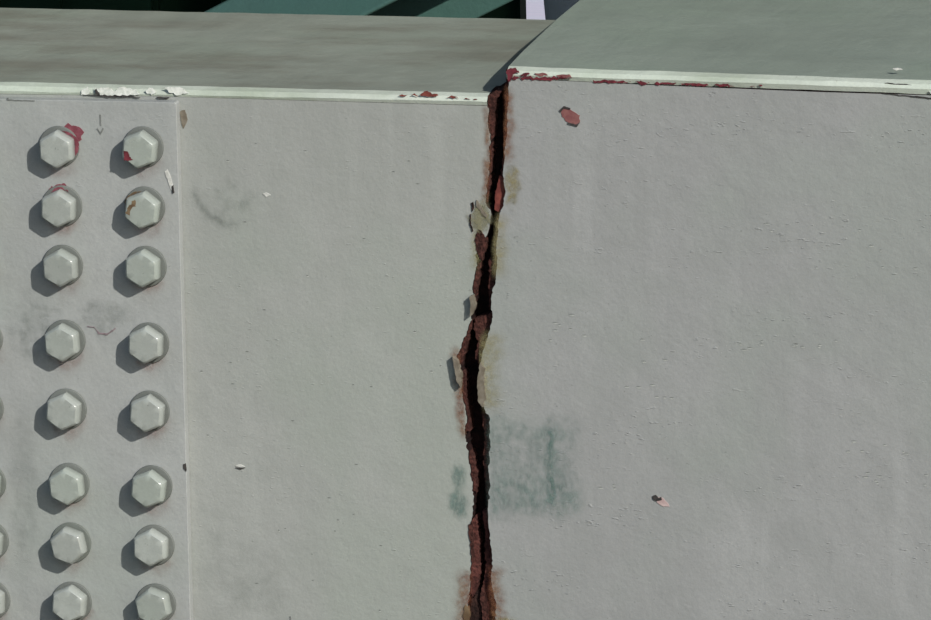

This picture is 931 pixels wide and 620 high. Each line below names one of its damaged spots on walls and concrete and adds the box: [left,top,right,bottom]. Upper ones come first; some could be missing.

peeling [506,68,572,82]
peeling [593,79,734,87]
peeling [399,91,477,100]
peeling [559,106,580,127]
peeling [63,123,84,155]
crack [452,68,509,620]